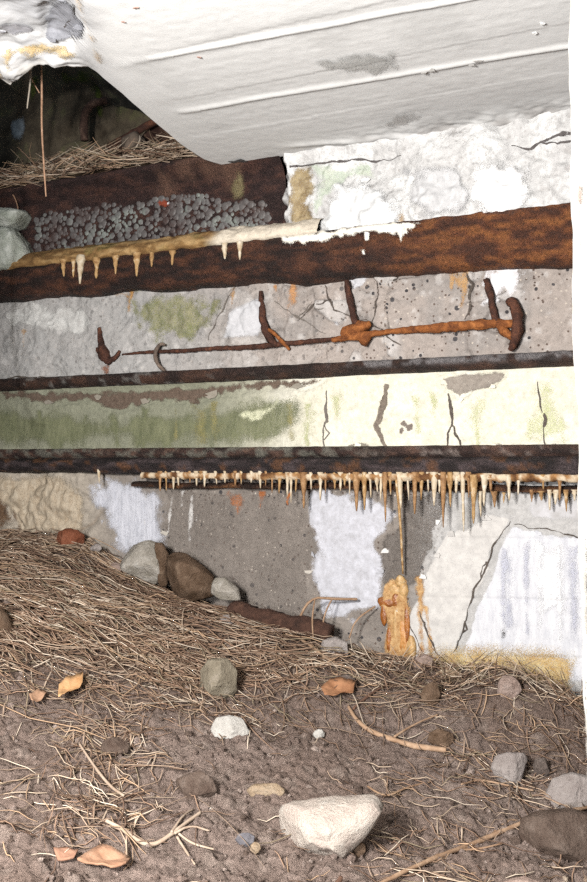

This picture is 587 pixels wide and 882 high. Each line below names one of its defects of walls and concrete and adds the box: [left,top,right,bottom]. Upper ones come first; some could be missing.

damp [315,51,402,75]
crack [511,131,571,151]
damp [7,218,419,284]
corrosion [449,272,471,308]
damp [238,398,312,446]
crack [373,384,389,446]
crack [447,394,461,445]
damp [0,469,578,574]
flaking render [161,489,583,682]
corrosion [378,575,434,659]